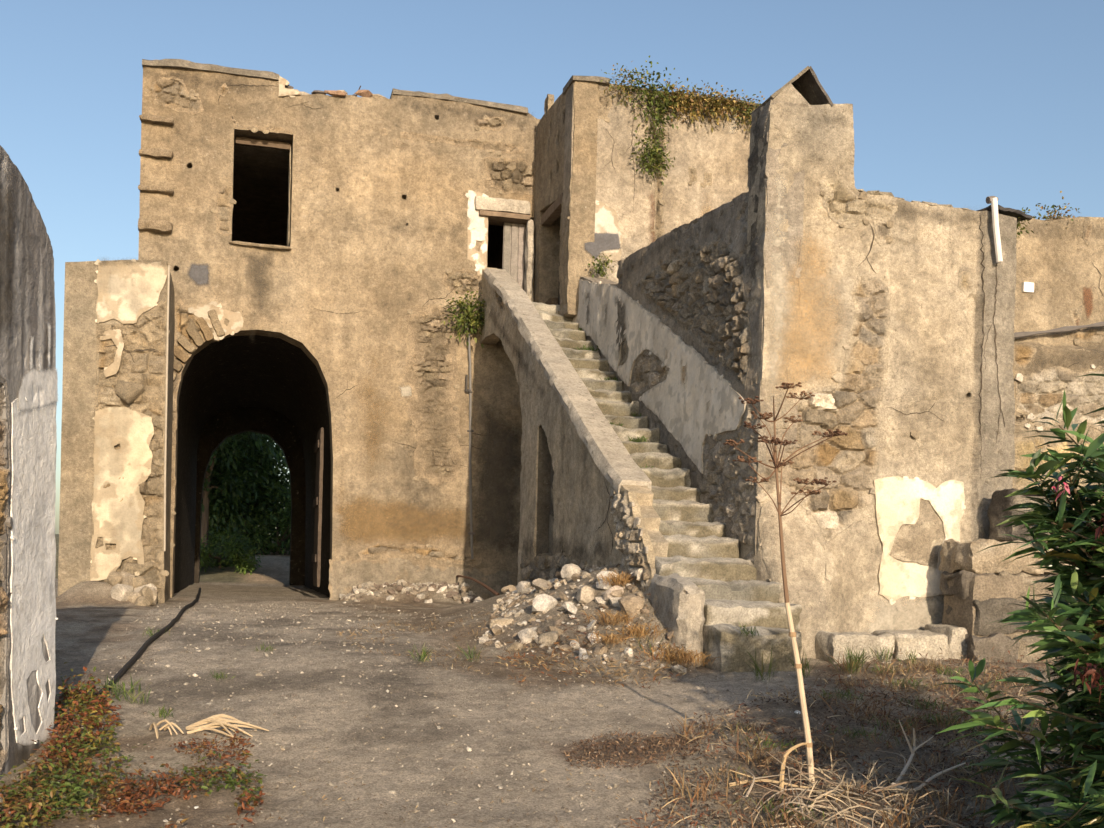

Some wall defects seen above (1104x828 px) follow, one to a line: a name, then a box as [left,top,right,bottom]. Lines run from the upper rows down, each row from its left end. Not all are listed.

spalling [392,115,535,296]
spalling [819,174,901,246]
peeling [5,397,58,746]
peeling [90,407,154,581]
peeling [94,259,168,378]
spalling [169,299,244,548]
spalling [404,304,463,486]
flaking render [573,239,966,605]
crack [978,216,1005,477]
spalling [1013,341,1104,490]